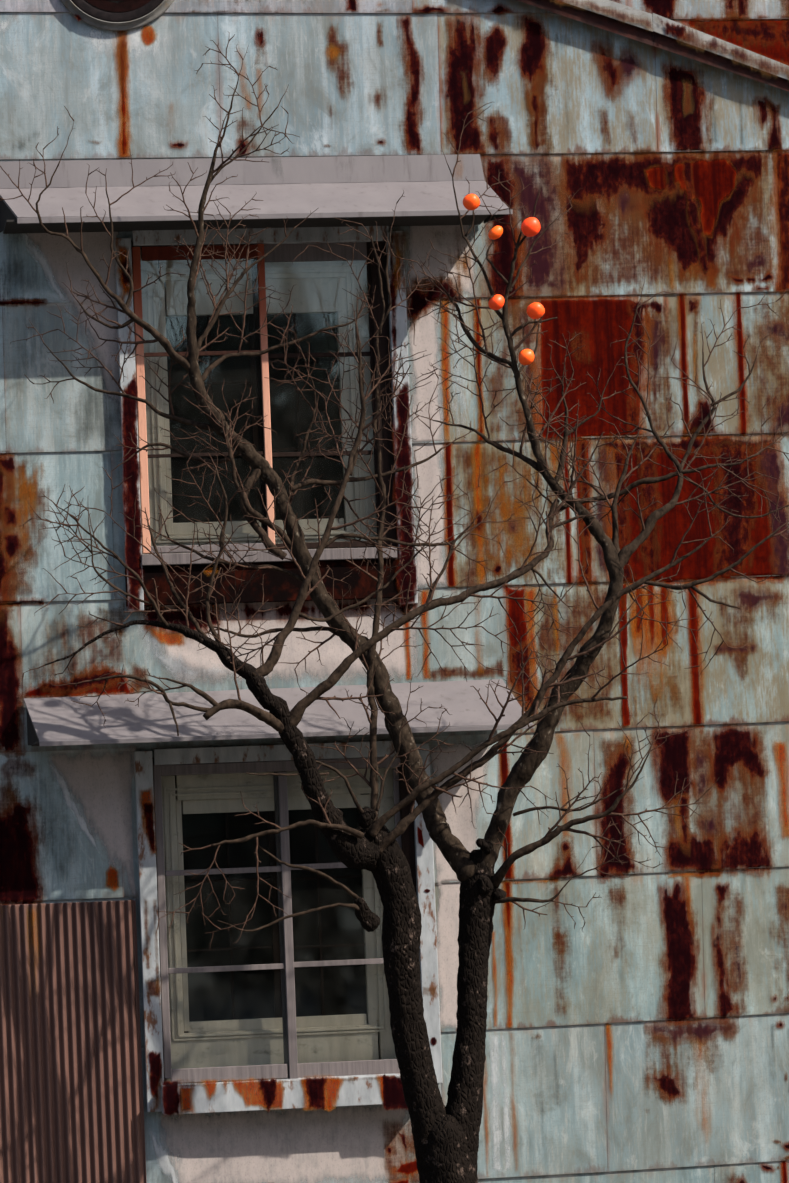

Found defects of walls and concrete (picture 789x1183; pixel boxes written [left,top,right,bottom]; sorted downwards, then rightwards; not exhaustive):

corrosion [116,30,130,159]
corrosion [141,26,155,45]
corrosion [555,0,789,77]
corrosion [400,15,789,1102]
corrosion [0,452,149,922]
corrosion [761,1160,788,1183]